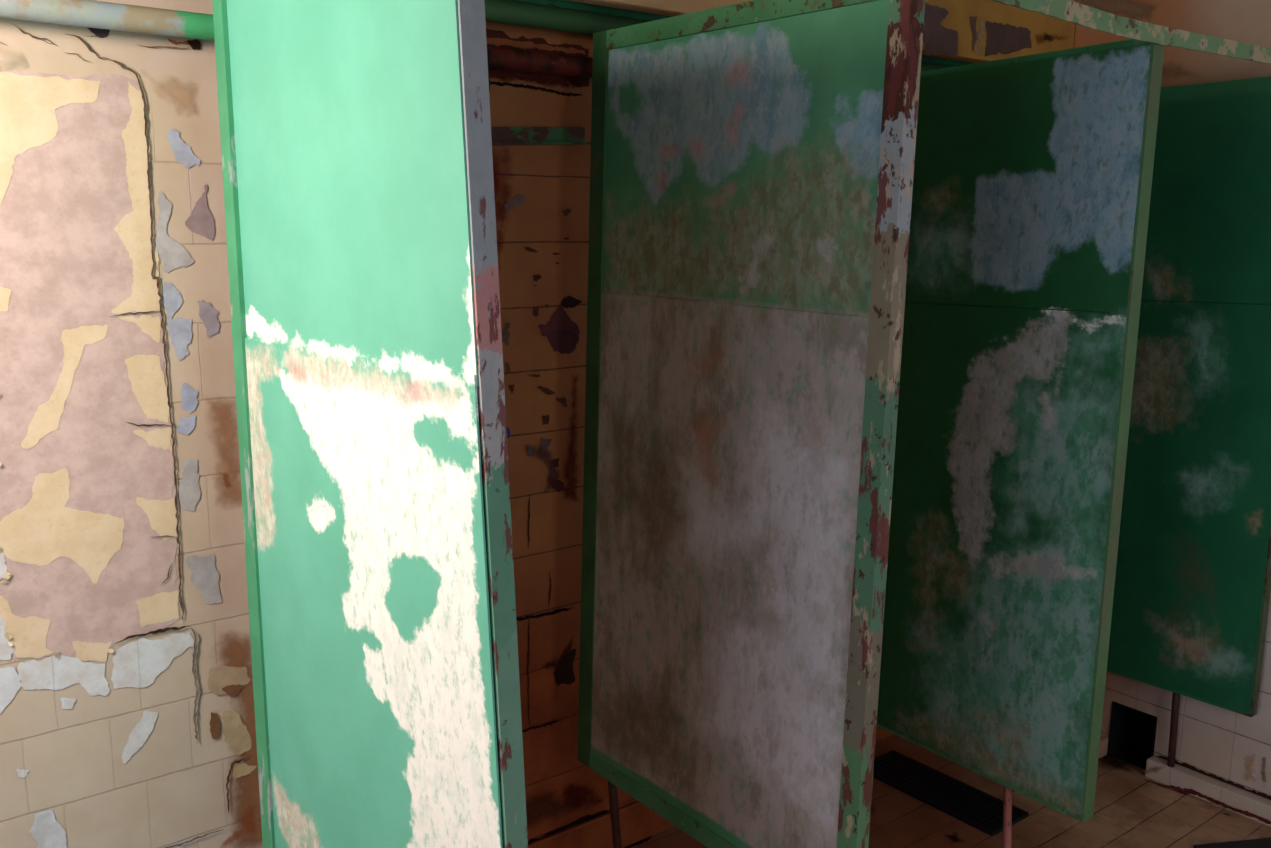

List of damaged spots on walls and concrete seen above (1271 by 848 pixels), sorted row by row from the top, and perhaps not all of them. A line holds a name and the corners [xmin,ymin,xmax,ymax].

peeling [923,3,1032,58]
corrosion [493,158,507,219]
peeling [502,322,511,346]
flaking render [533,296,582,354]
crack [0,24,200,744]
flaking render [0,70,222,713]
crack [525,498,533,549]
crack [516,573,574,732]
peeling [121,711,158,764]
flaking render [207,665,256,778]
crack [528,811,610,844]